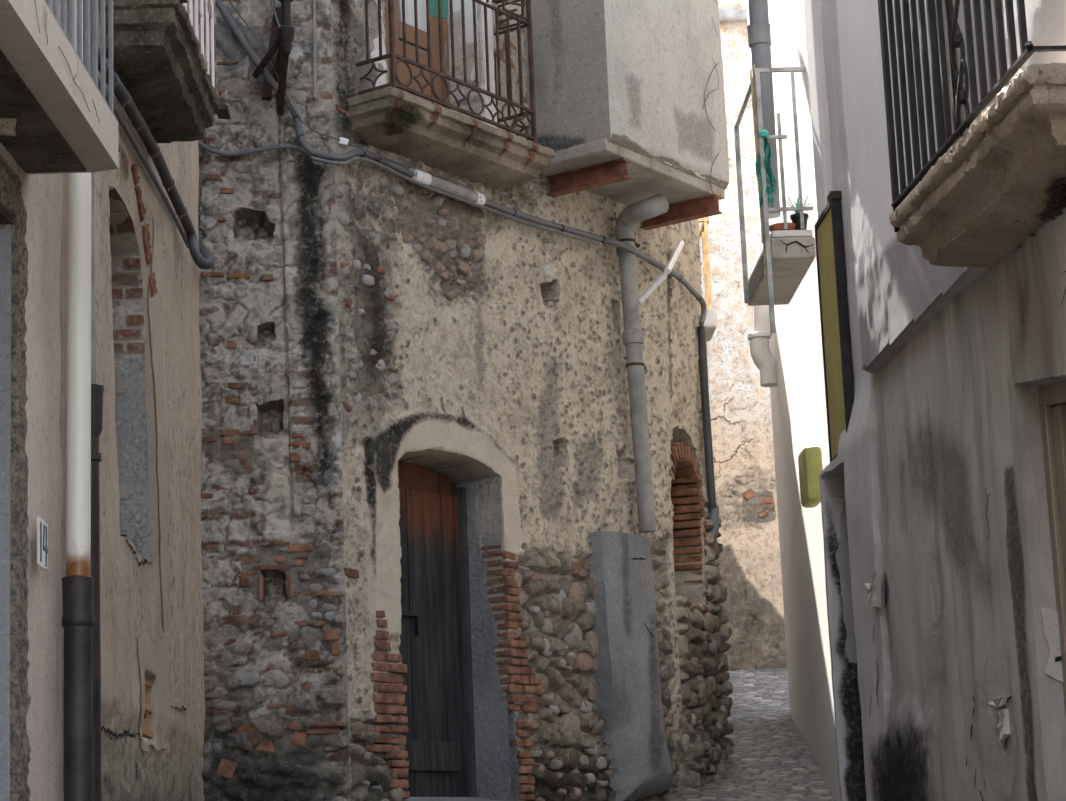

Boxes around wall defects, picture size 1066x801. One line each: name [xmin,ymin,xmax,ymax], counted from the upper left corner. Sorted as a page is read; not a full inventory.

crack [34,0,100,123]
spalling [131,164,157,297]
mould [1030,177,1066,237]
leakage [295,155,333,502]
mould [363,412,475,558]
leakage [827,510,923,801]
crack [101,725,143,744]